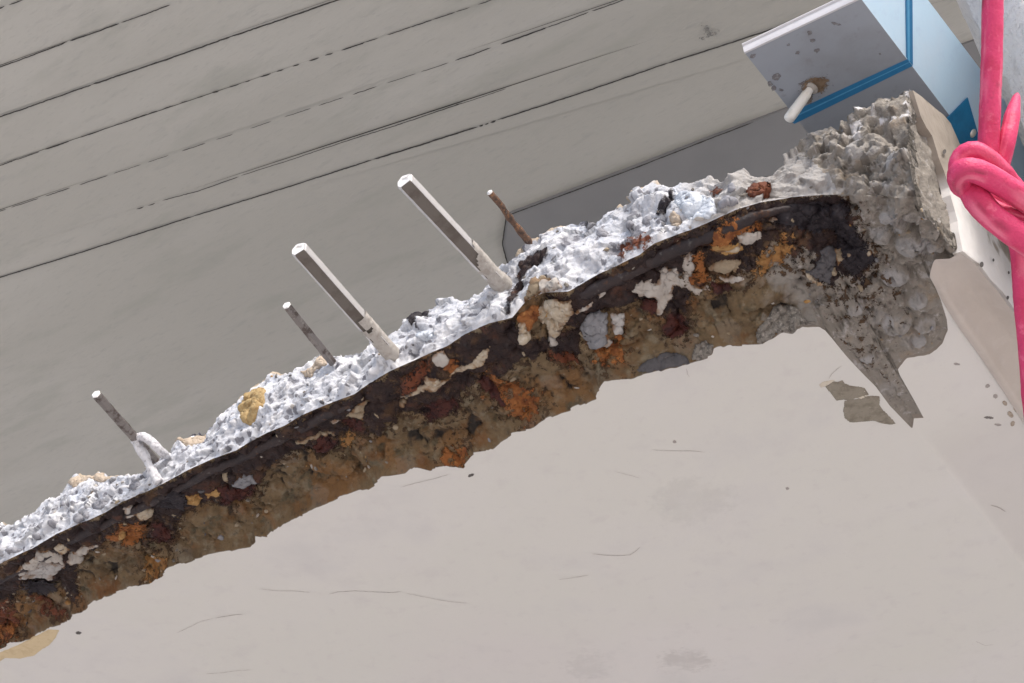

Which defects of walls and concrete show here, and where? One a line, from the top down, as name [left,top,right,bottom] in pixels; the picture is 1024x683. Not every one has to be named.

crack [0,0,778,278]
rust [0,181,909,649]
spalling [0,89,957,661]
crack [502,122,753,315]